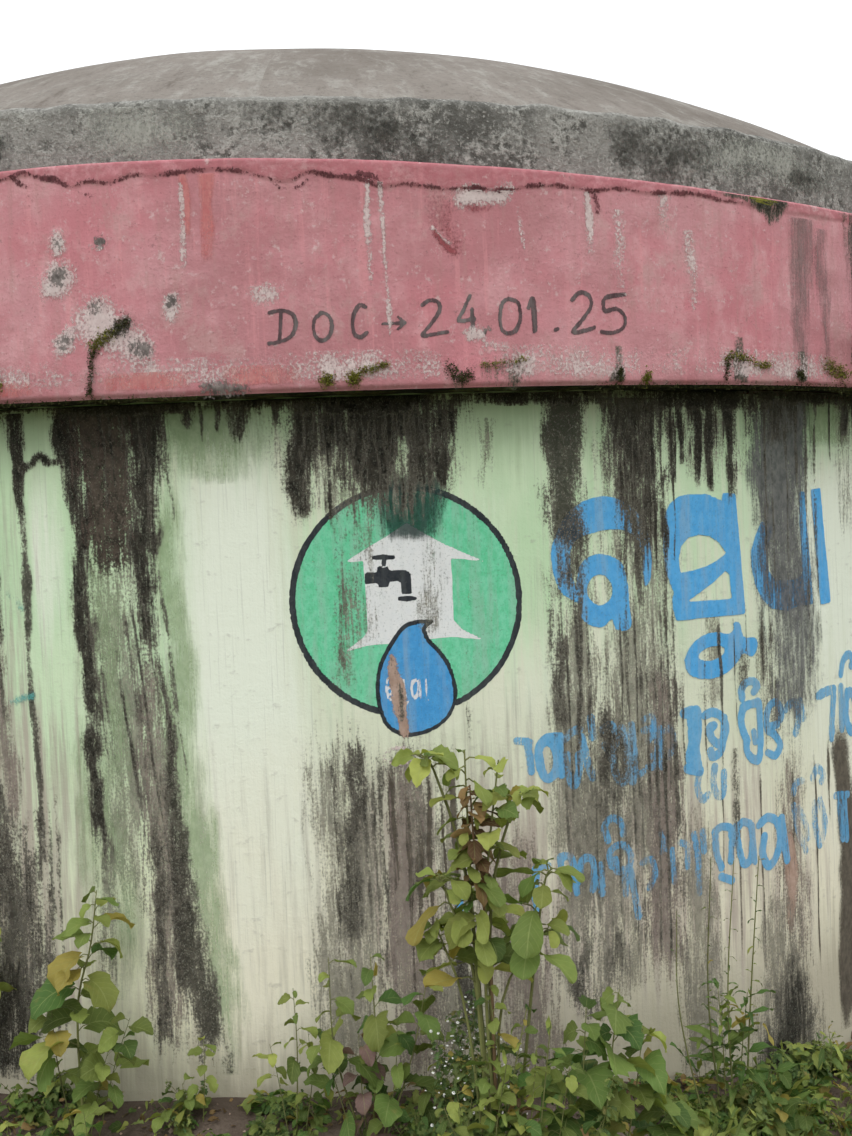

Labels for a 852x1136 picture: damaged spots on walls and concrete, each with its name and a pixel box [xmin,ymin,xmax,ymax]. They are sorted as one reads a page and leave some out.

peeling [41,229,77,299]
peeling [51,291,181,389]
leakage [0,173,852,1081]